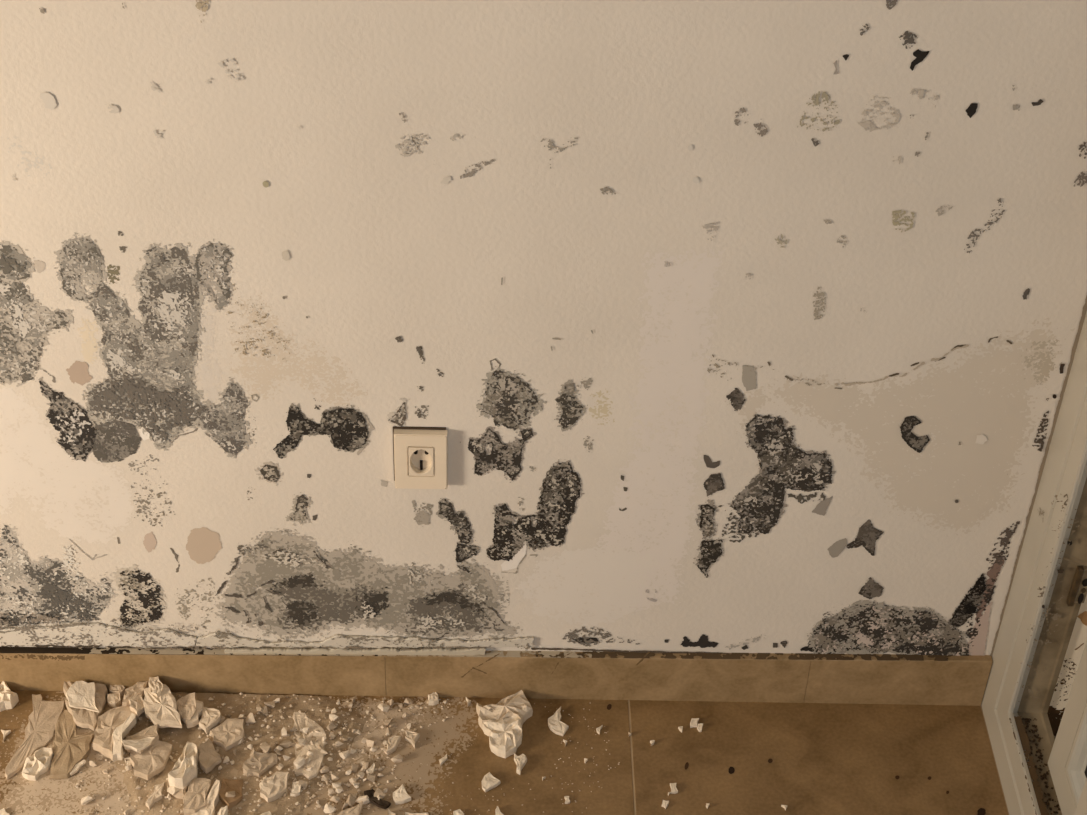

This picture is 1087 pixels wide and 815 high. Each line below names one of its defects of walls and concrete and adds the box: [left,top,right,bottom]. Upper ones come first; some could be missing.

damp [0,233,374,552]
damp [0,358,615,640]
damp [664,634,787,650]
damp [693,318,1075,656]